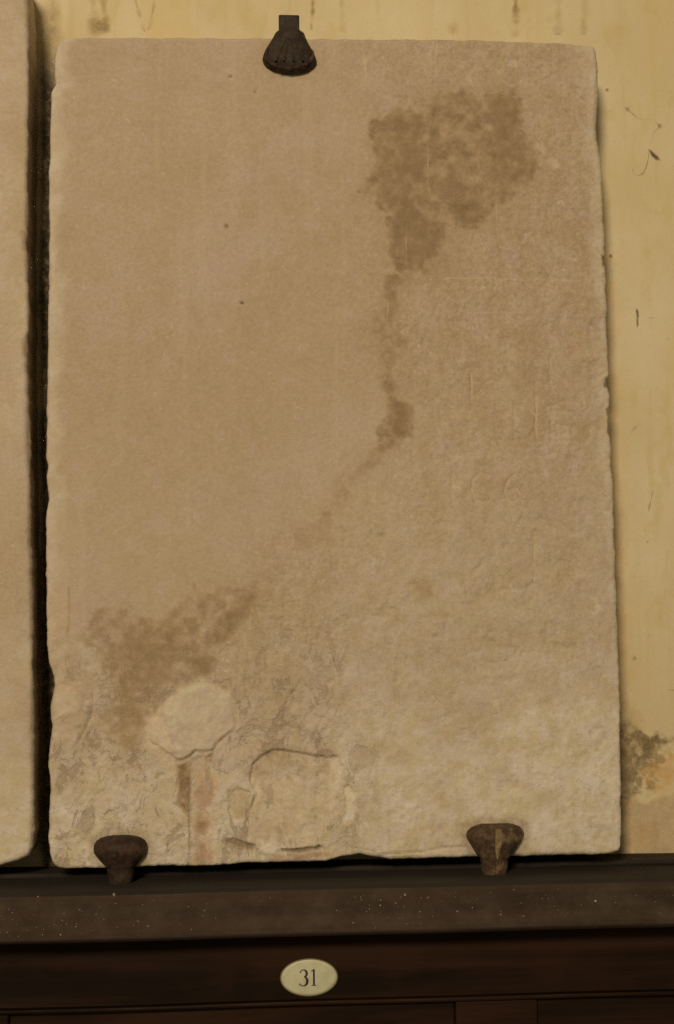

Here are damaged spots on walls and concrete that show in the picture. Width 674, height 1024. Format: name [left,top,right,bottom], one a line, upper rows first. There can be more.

leakage [357,88,537,321]
leakage [376,381,413,450]
mould [620,724,667,799]